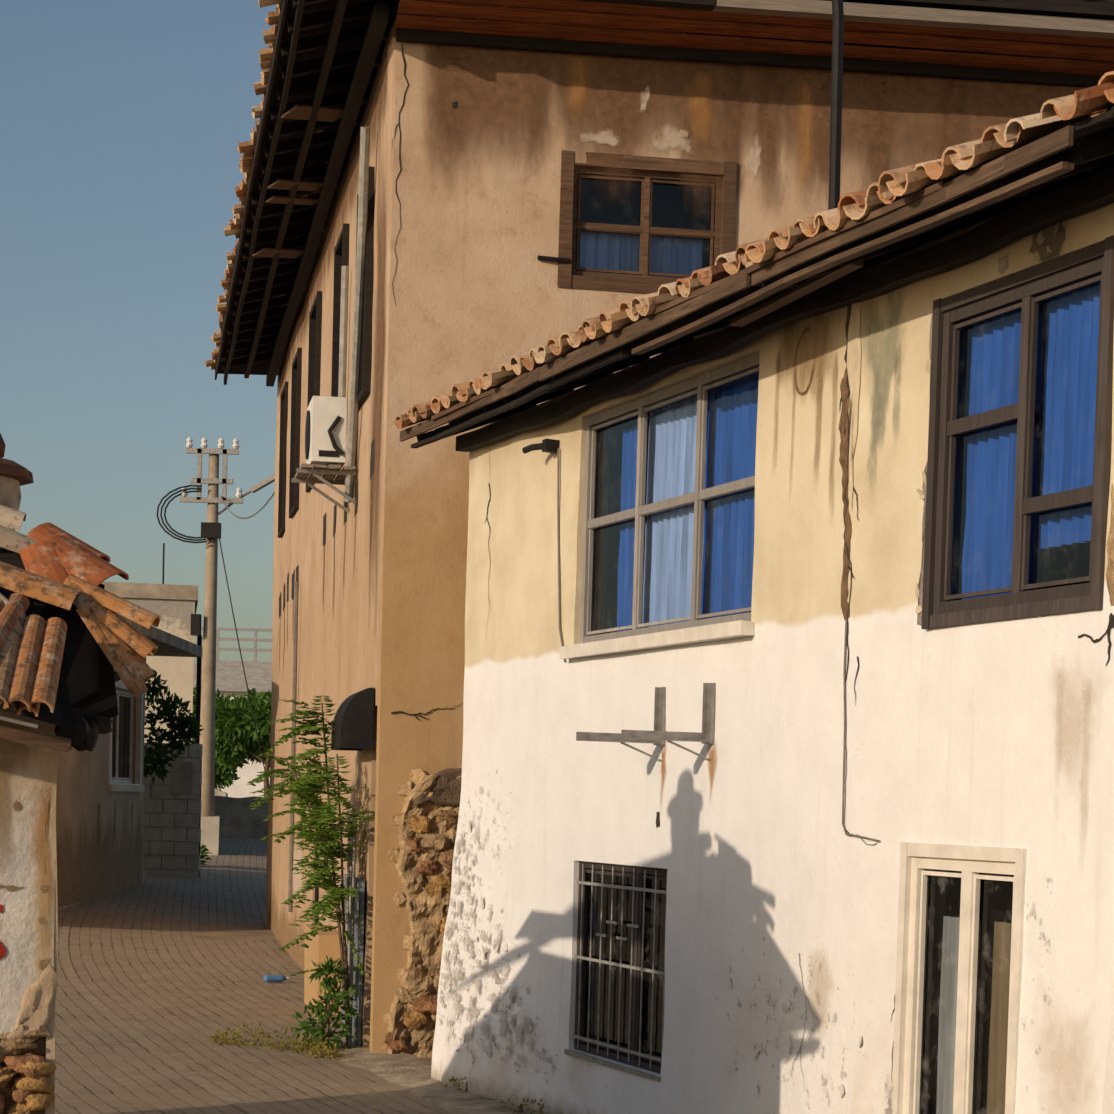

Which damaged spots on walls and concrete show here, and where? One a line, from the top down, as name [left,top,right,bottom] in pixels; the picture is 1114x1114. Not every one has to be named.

crack [392,44,409,305]
flaking render [581,131,617,146]
flaking render [640,87,649,110]
flaking render [653,127,690,152]
water stain [431,45,1089,183]
water stain [868,310,899,432]
crack [839,305,859,704]
crack [1078,613,1114,665]
crack [391,704,461,720]
spalling [380,768,555,1082]
spalling [0,958,57,1114]